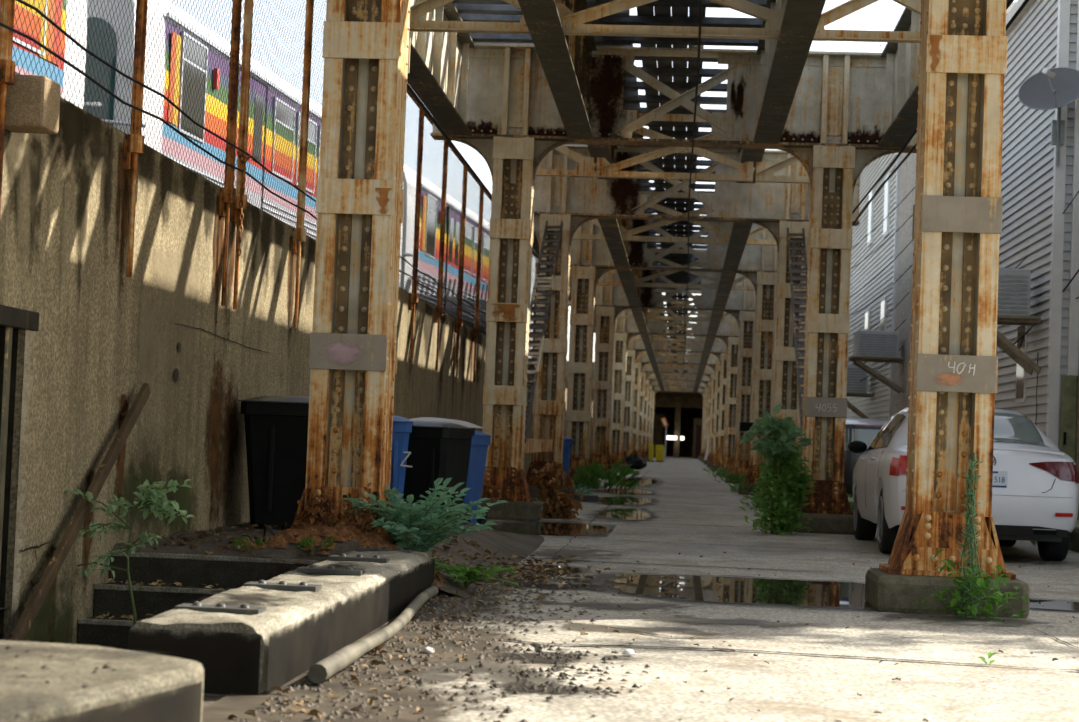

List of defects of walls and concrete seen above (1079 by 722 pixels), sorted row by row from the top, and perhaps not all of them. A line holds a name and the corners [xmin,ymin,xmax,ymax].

corrosion [589,55,626,138]
corrosion [930,35,942,72]
damp [7,100,114,283]
damp [139,143,215,236]
damp [240,203,284,293]
damp [296,238,316,324]
corrosion [375,188,391,214]
corrosion [606,152,656,307]
corrosion [206,361,238,520]